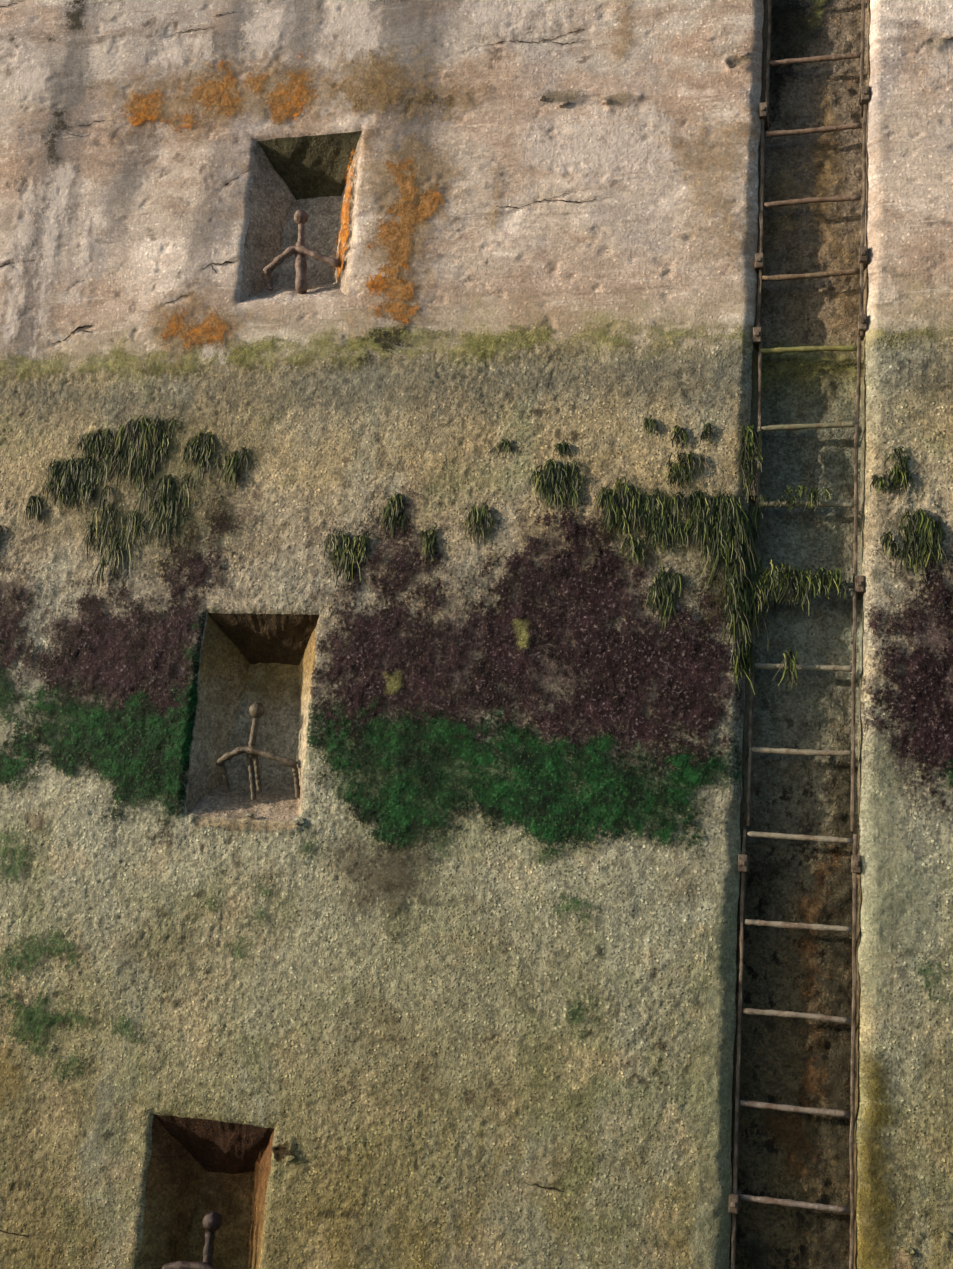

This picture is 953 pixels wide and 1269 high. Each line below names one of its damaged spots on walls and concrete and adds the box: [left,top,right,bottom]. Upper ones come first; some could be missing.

leakage [0,0,86,360]